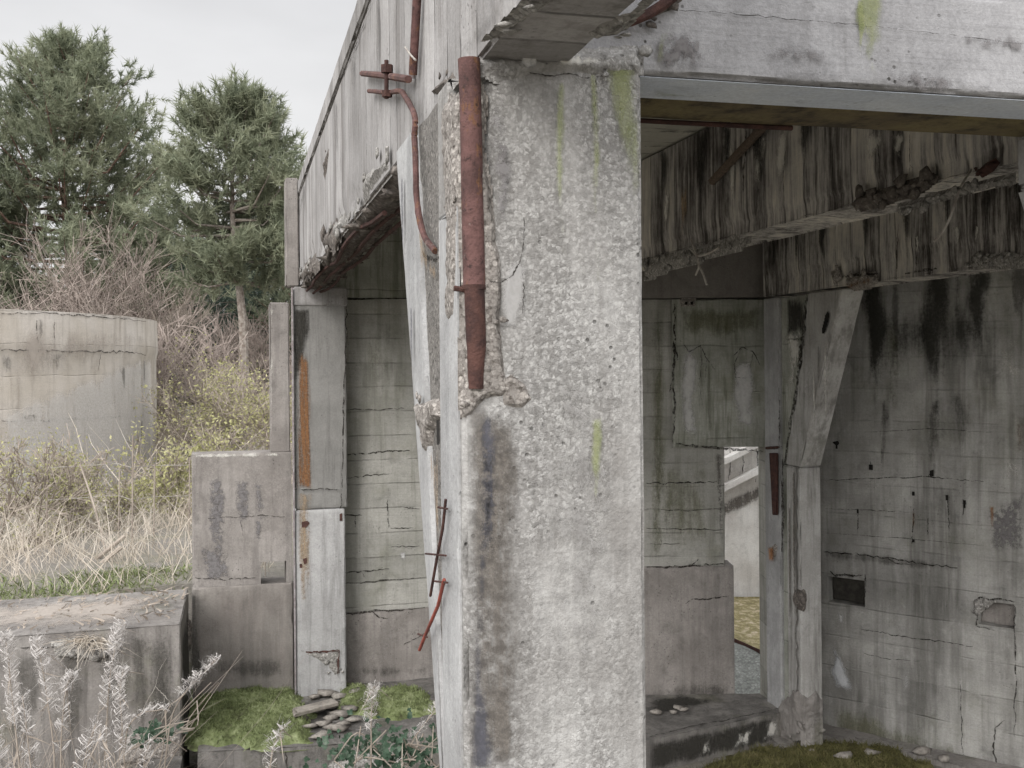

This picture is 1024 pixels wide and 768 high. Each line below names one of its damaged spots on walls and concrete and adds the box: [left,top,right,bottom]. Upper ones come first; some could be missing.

spalling [298,146,401,294]
spalling [432,0,701,419]
spalling [852,158,1016,216]
water stain [863,273,990,371]
corrosion [298,356,311,588]
spalling [308,649,344,675]
crack [301,298,410,527]
crack [345,501,417,584]
water stain [474,414,516,767]
crack [647,304,782,569]
spalling [778,690,826,747]